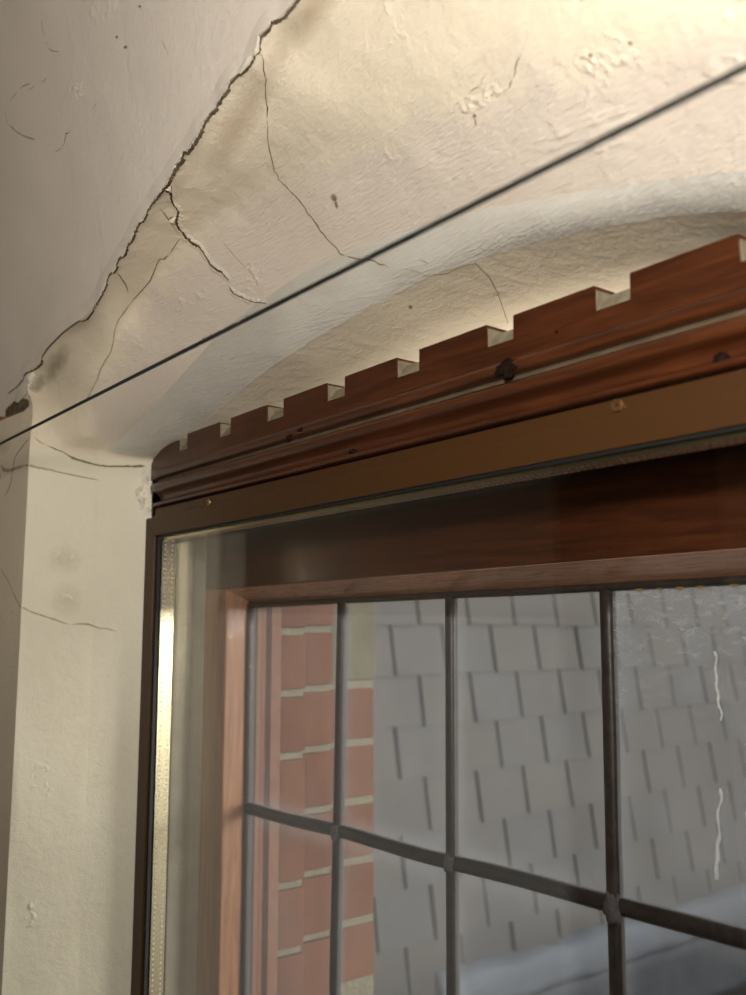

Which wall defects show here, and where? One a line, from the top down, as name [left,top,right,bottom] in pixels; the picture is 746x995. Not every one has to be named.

crack [7,0,508,403]
crack [0,438,144,493]
crack [0,569,117,632]